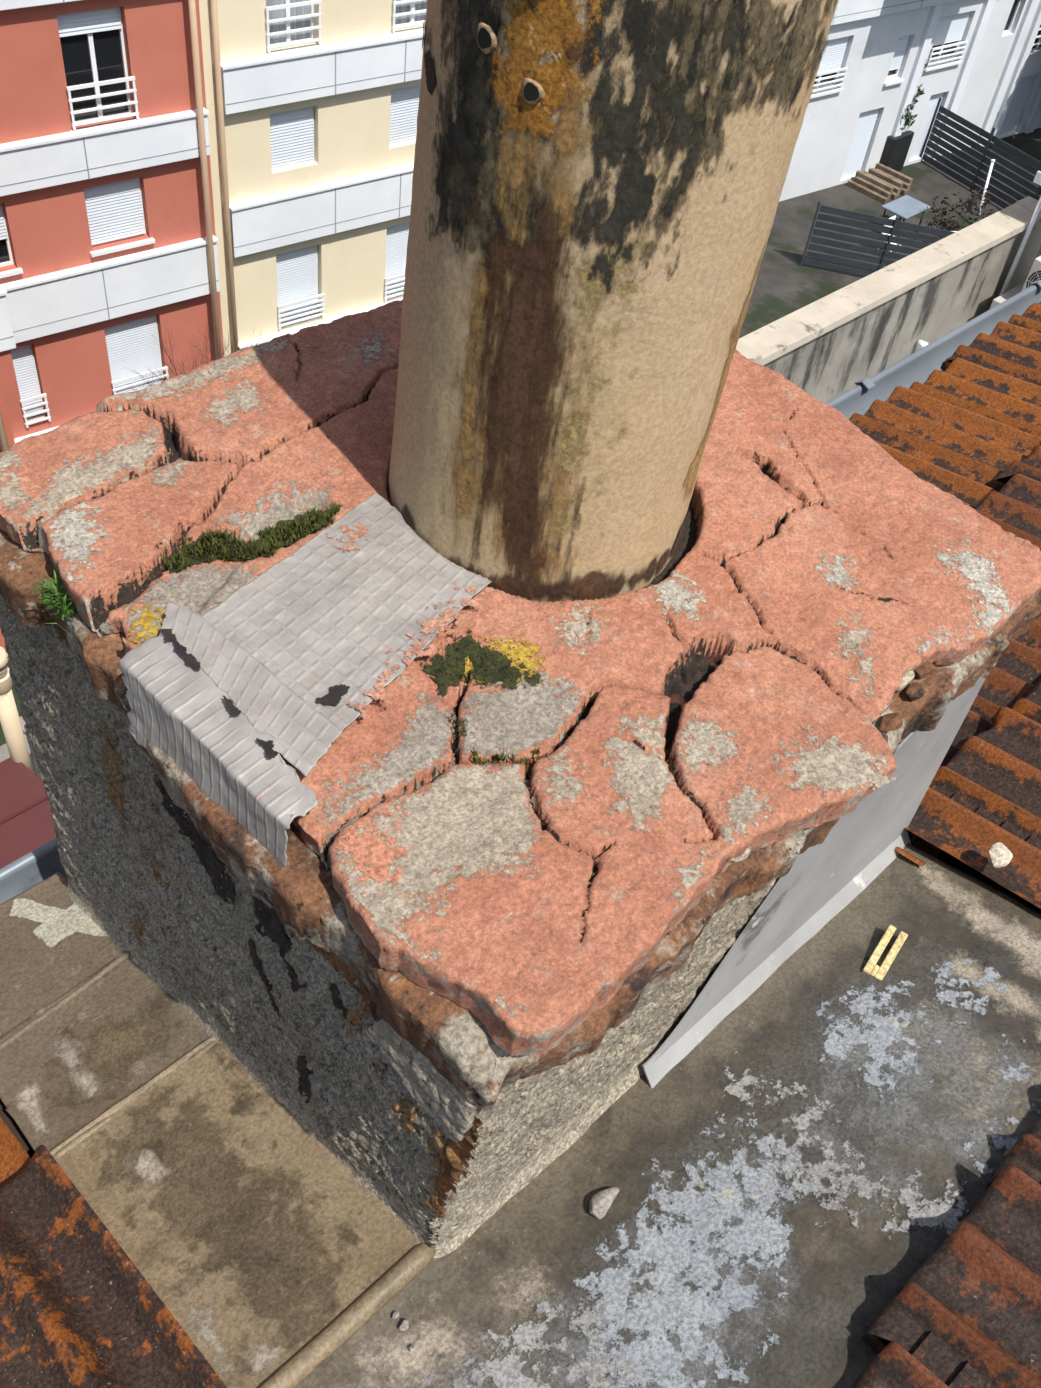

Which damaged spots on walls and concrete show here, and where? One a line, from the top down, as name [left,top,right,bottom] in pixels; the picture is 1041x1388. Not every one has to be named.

rust [489,0,602,245]
peeling [0,336,290,589]
crack [19,386,375,632]
peeling [113,481,345,643]
leakage [345,0,839,719]
crack [631,408,852,844]
spalling [153,774,235,911]
crack [322,680,467,861]
crack [524,684,615,942]
leakage [97,1044,345,1374]
leakage [338,1152,799,1388]
leakage [805,1003,1041,1215]